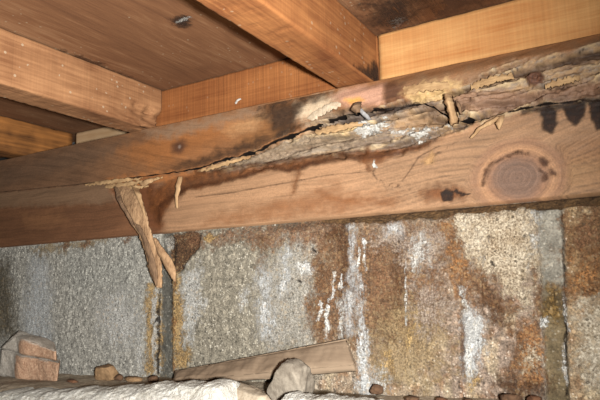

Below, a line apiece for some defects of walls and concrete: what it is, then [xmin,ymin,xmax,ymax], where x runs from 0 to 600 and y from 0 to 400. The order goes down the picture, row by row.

water stain [260,99,301,136]
peeling [351,102,372,121]
water stain [317,272,343,338]
water stain [354,305,371,395]
water stain [404,279,486,392]
water stain [356,204,564,327]